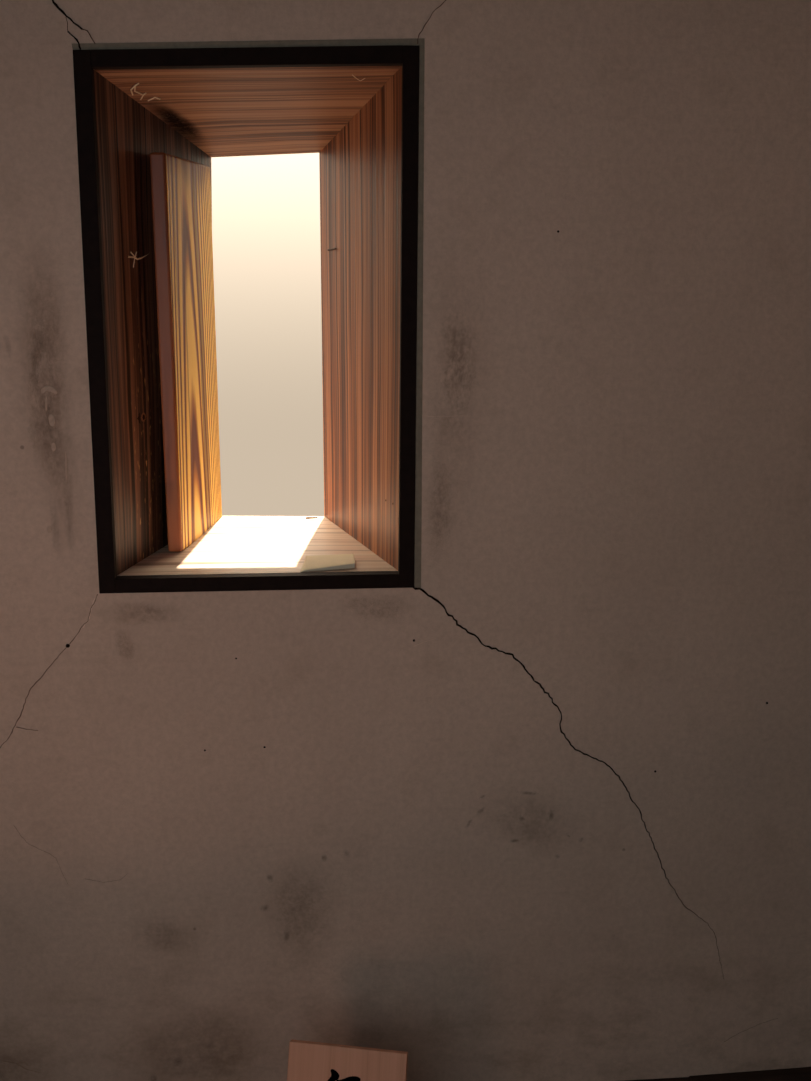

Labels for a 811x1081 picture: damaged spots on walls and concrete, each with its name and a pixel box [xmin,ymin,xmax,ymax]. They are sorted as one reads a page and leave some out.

crack [52,0,95,50]
crack [0,594,98,748]
crack [413,587,723,973]